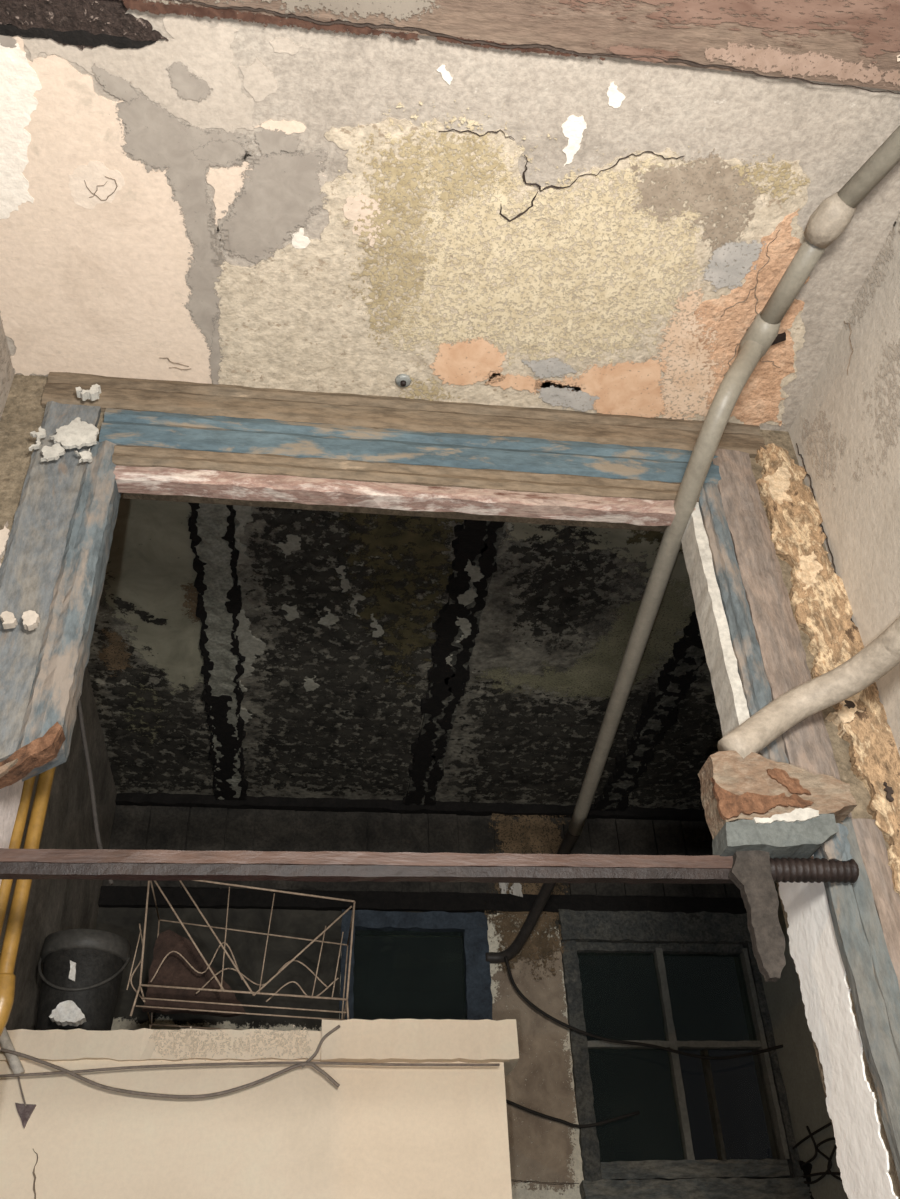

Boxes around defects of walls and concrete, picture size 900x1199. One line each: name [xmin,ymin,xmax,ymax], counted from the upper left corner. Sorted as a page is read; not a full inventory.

peeling [0,0,811,426]
crack [440,129,684,222]
peeling [29,417,99,463]
peeling [0,521,10,566]
flaking render [755,443,864,679]
peeling [0,610,40,631]
flaking render [825,682,900,895]
crack [31,1149,39,1199]